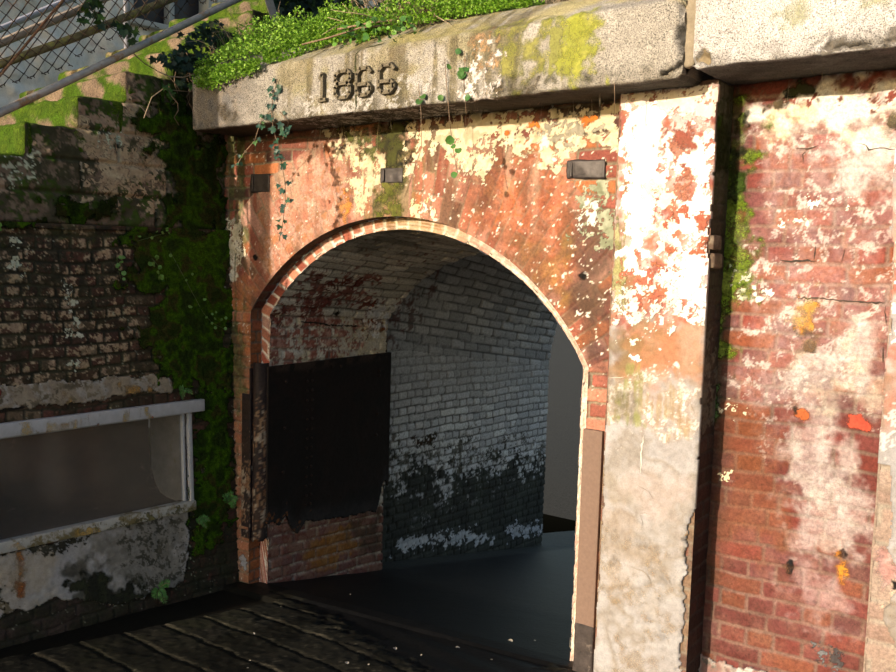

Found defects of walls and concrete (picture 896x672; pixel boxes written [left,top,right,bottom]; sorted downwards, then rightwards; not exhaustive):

water stain [526,7,604,98]
spalling [676,25,686,45]
spalling [762,78,819,113]
peeling [322,128,386,216]
peeling [225,218,246,265]
peeling [403,84,718,362]
peeling [778,193,852,228]
peeling [270,275,364,334]
peeling [729,264,774,303]
water stain [389,523,495,558]
water stain [505,519,543,545]
spalling [875,548,896,609]